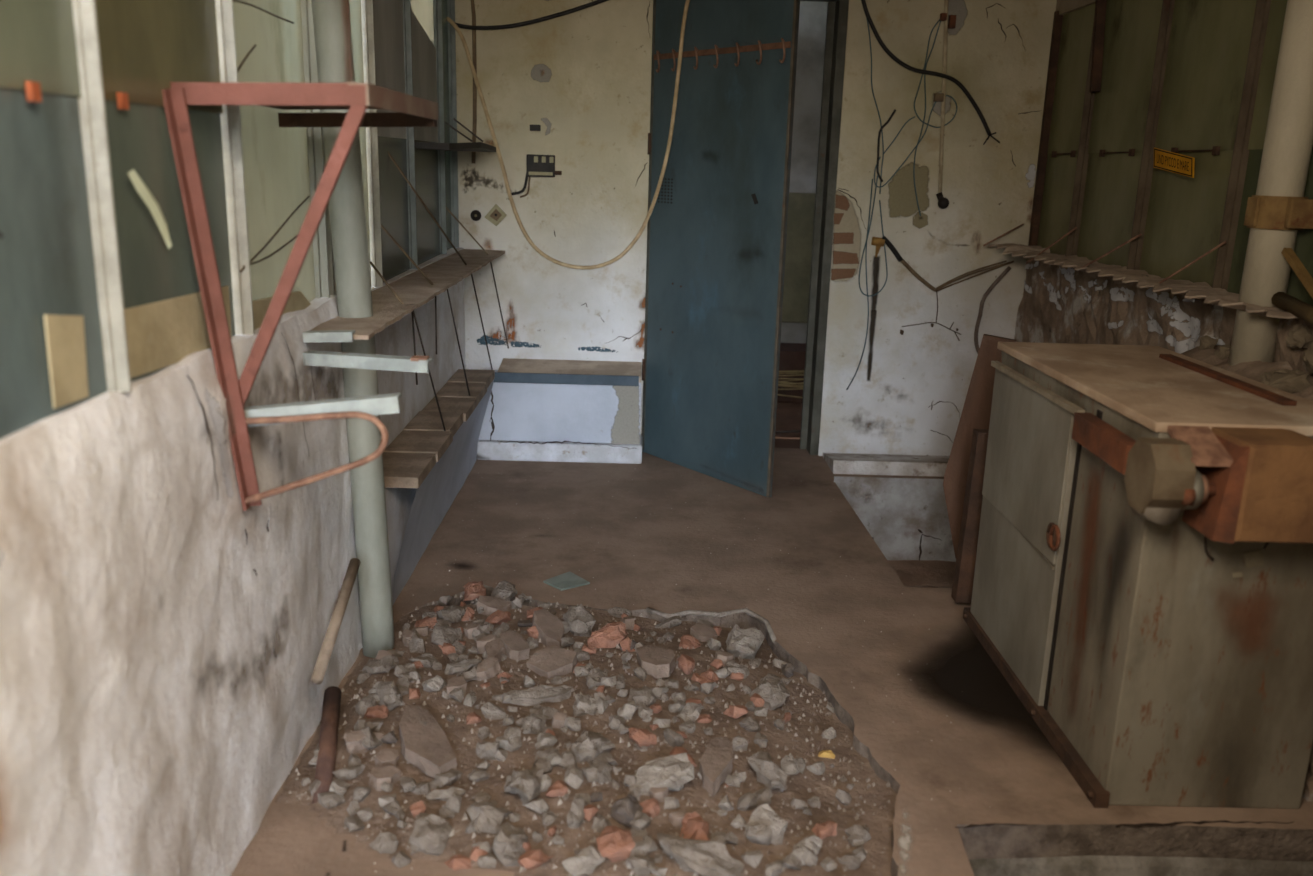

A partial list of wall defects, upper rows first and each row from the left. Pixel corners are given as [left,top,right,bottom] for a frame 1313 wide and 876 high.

spalling [831,191,861,281]
peeling [1024,261,1225,354]
peeling [611,385,640,445]